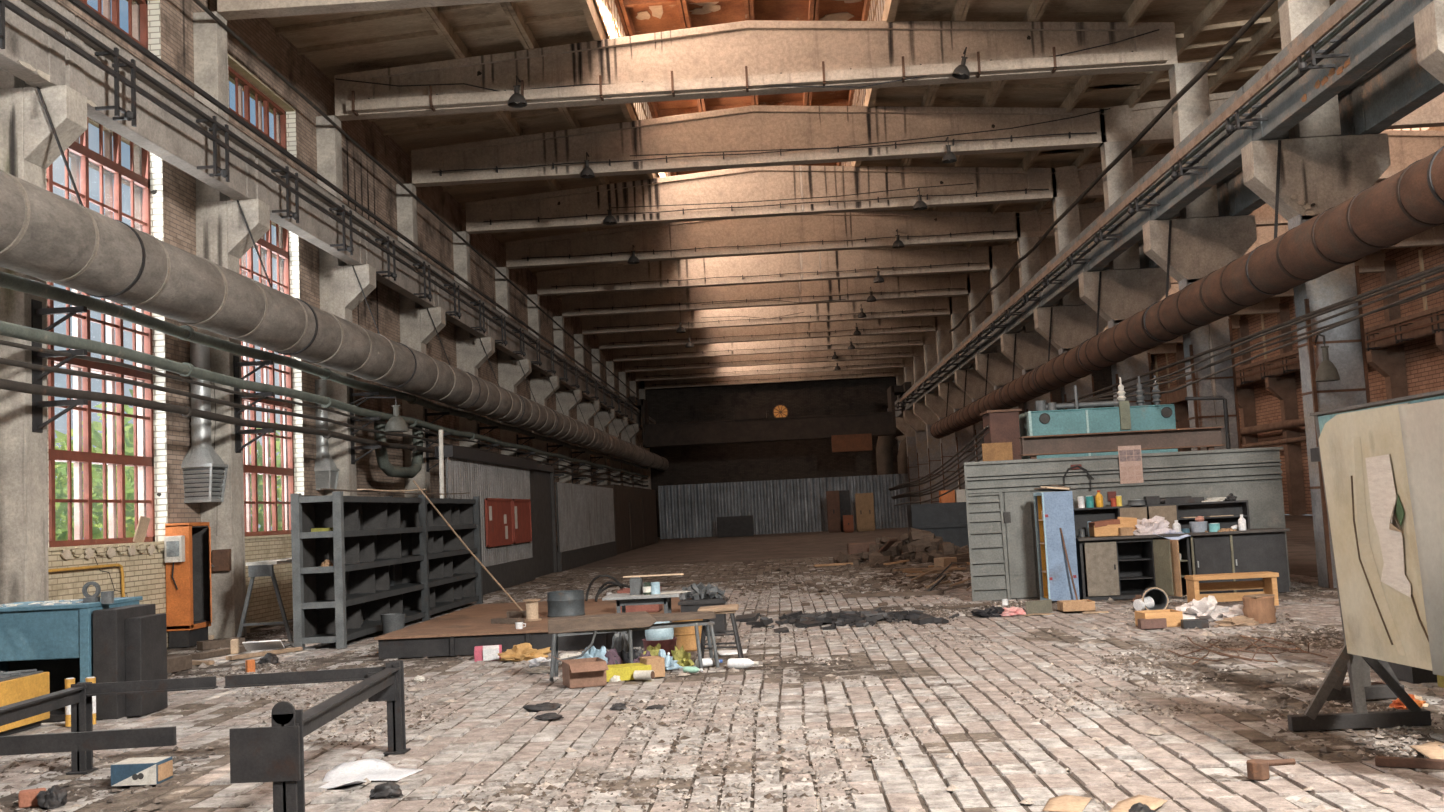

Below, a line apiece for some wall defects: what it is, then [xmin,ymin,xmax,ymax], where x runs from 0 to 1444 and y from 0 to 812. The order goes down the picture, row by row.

water stain [571,36,632,100]